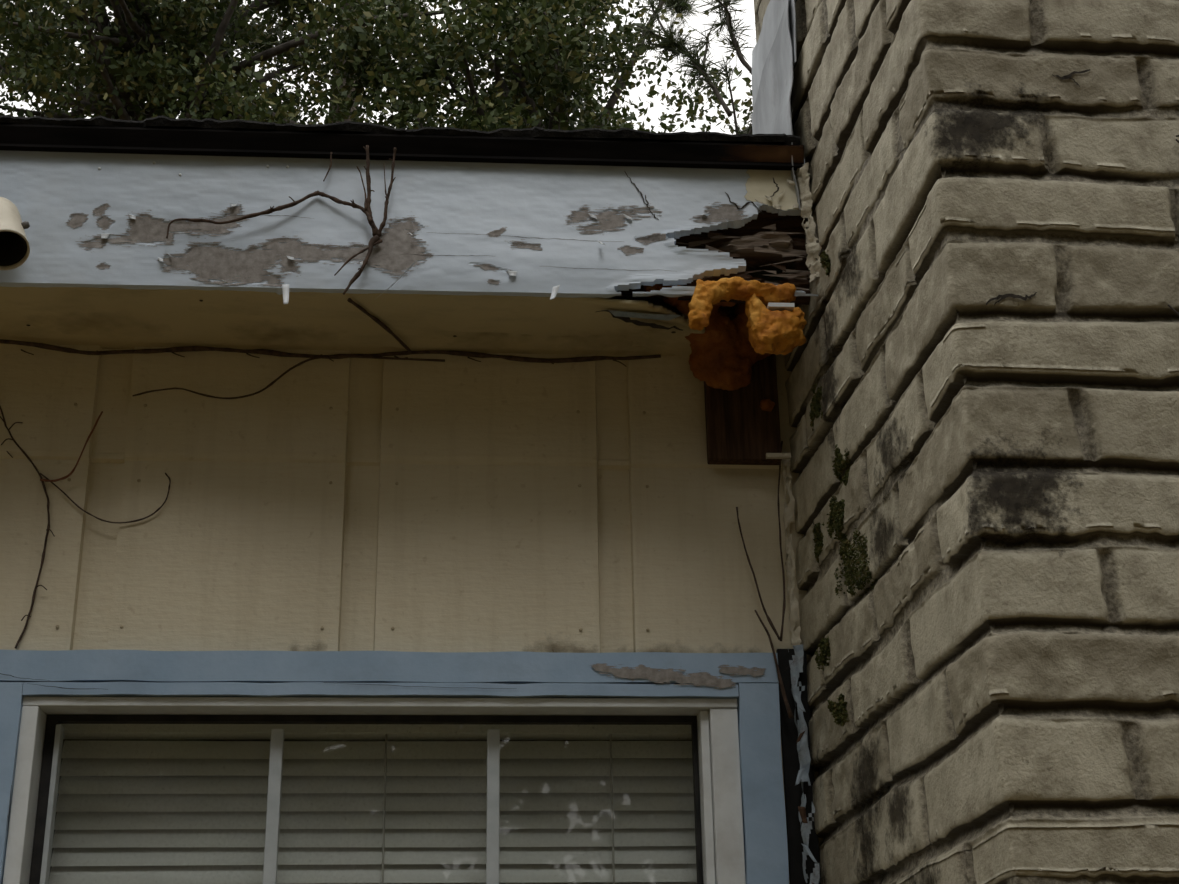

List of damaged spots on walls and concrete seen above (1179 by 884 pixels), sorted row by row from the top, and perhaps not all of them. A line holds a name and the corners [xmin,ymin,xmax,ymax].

peeling [66,203,433,304]
peeling [565,203,666,255]
peeling [591,663,766,689]